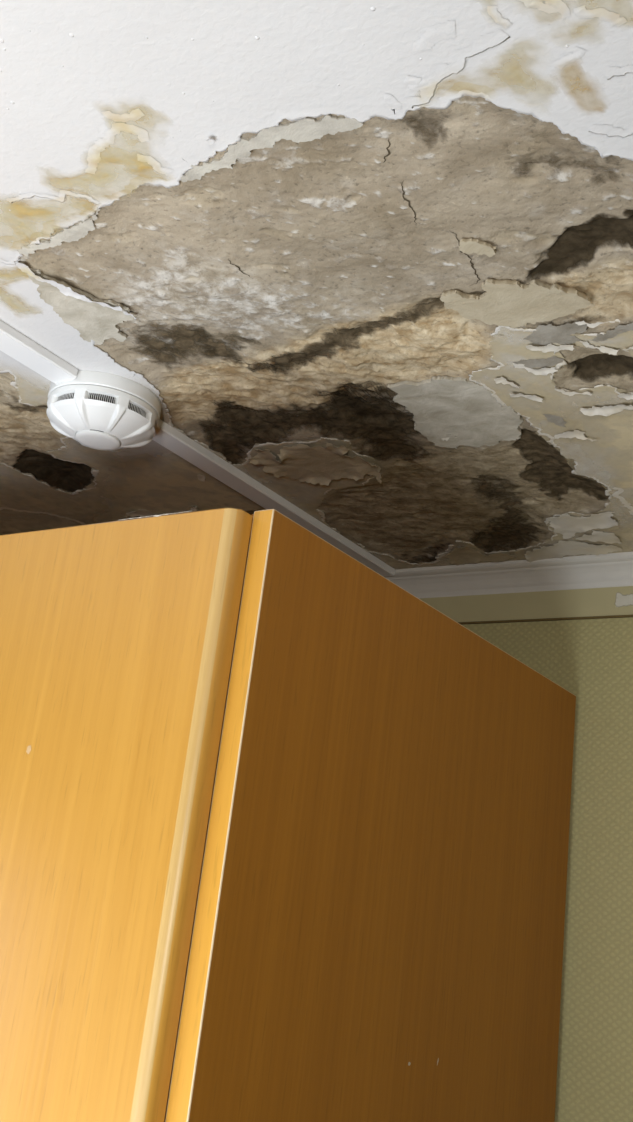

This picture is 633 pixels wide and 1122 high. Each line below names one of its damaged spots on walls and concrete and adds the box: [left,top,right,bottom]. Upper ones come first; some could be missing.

crack [400,0,633,108]
water stain [0,201,59,242]
water stain [50,141,156,210]
water stain [0,269,29,311]
spalling [0,82,633,566]
water stain [244,328,633,569]